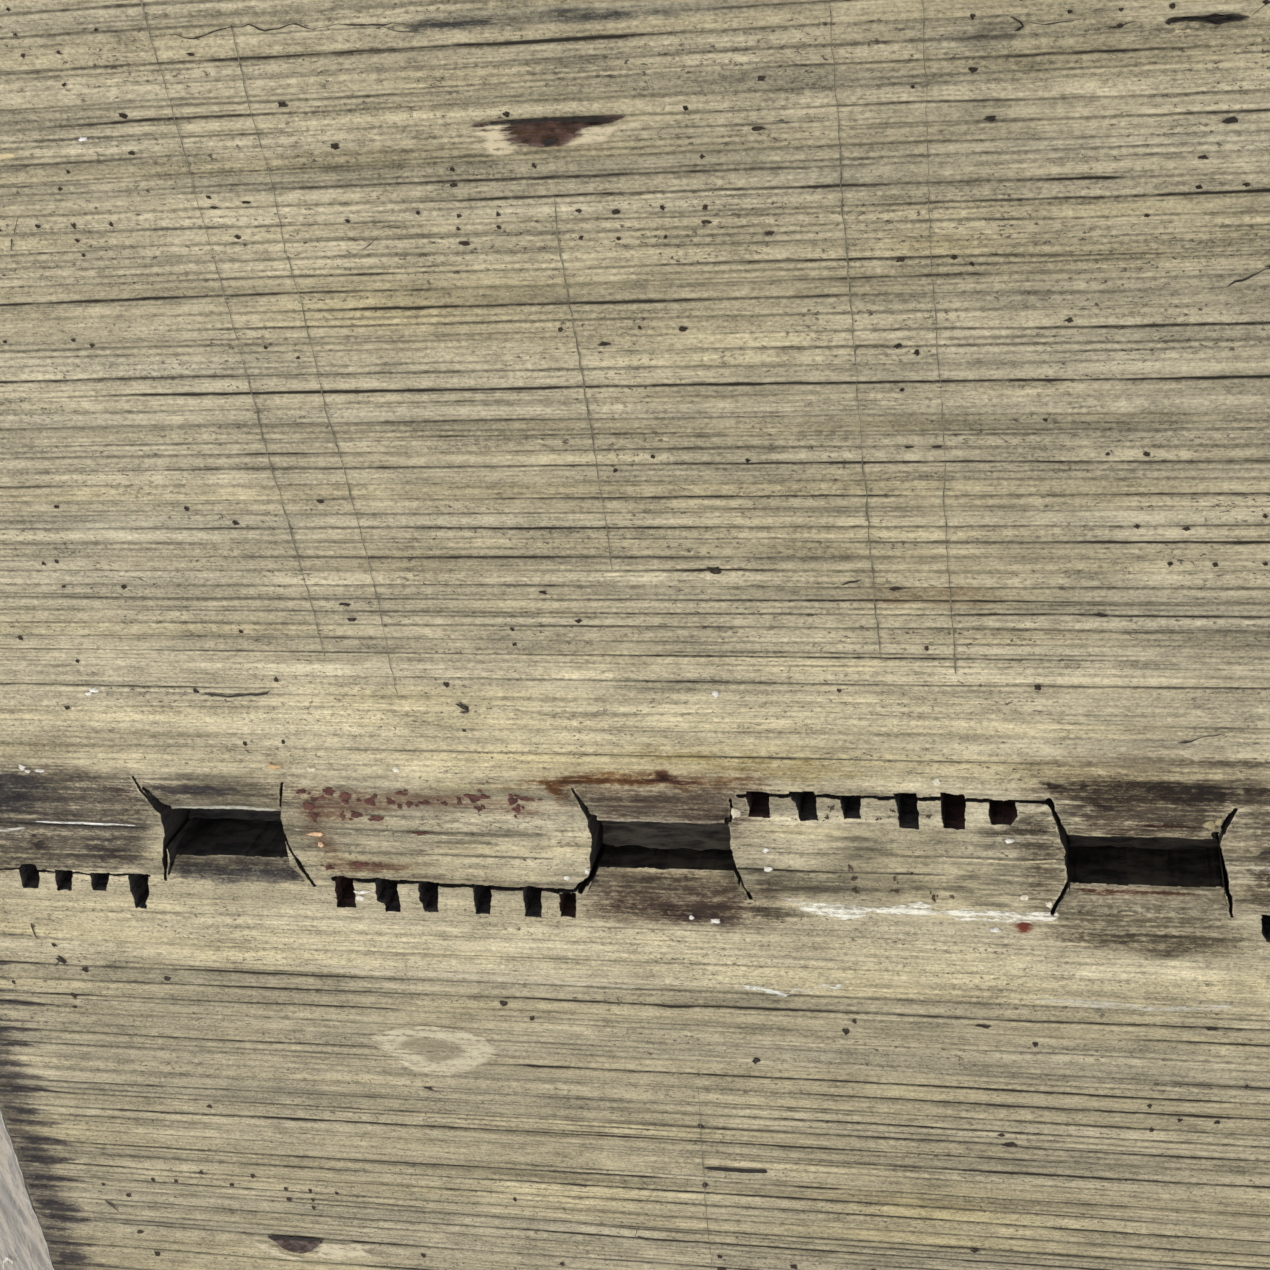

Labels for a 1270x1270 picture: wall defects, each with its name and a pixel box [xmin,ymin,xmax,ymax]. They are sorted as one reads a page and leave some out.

leakage [0,821,134,832]
spalling [142,763,288,875]
corrosion [296,771,695,822]
spalling [585,798,753,900]
leakage [784,898,1058,923]
spalling [1045,812,1232,918]